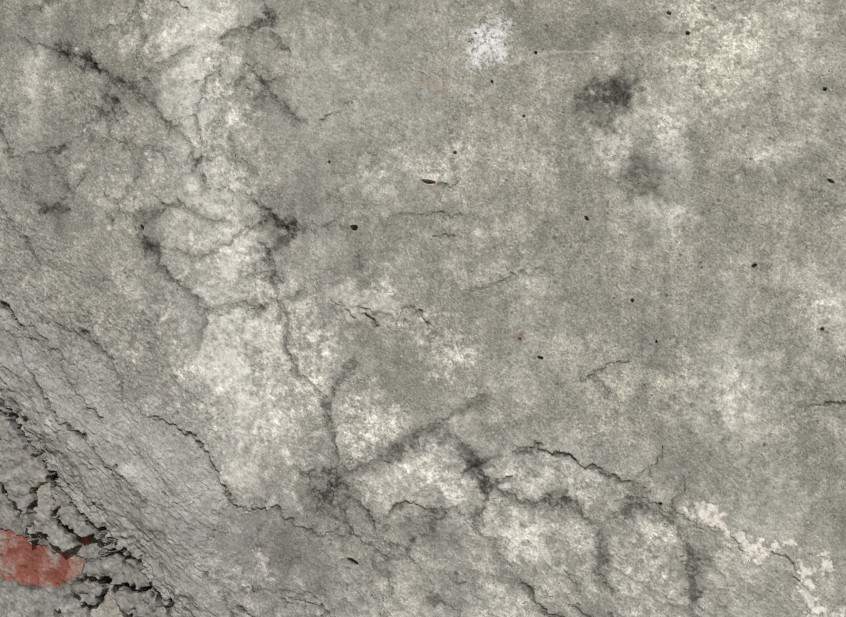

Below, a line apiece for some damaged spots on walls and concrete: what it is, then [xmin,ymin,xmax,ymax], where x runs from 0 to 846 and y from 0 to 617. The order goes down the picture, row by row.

crack [0,0,358,442]
crack [378,210,478,243]
crack [452,264,544,303]
crack [395,305,430,328]
crack [578,360,629,399]
crack [0,300,180,513]
crack [800,400,846,408]
spalling [0,399,174,617]
crack [148,393,711,617]
water stain [681,500,786,560]
water stain [820,551,834,576]
water stain [797,579,829,617]